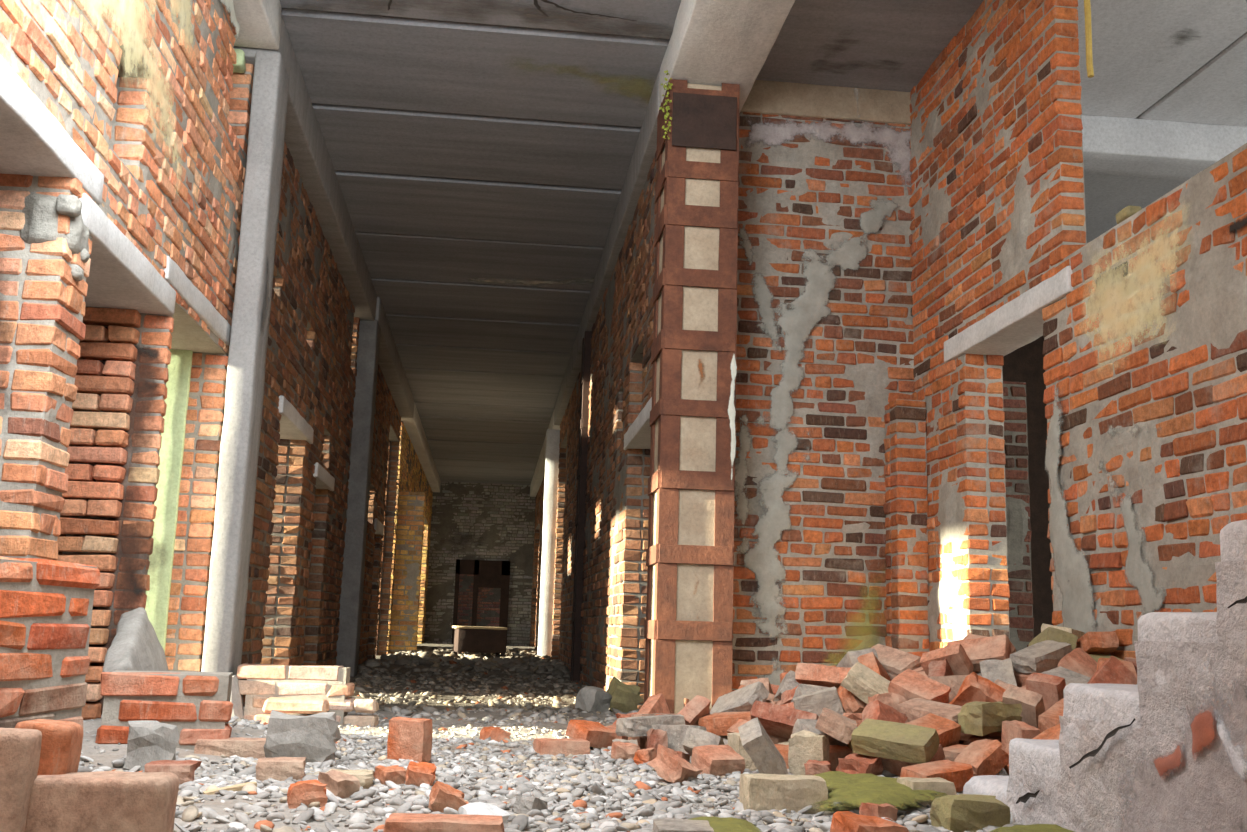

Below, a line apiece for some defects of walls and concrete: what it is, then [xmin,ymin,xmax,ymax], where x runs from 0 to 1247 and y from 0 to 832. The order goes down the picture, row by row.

crack [534,0,637,21]
crack [1227,596,1247,608]
crack [1069,718,1135,769]
spalling [1120,681,1247,832]
crack [1016,790,1040,804]